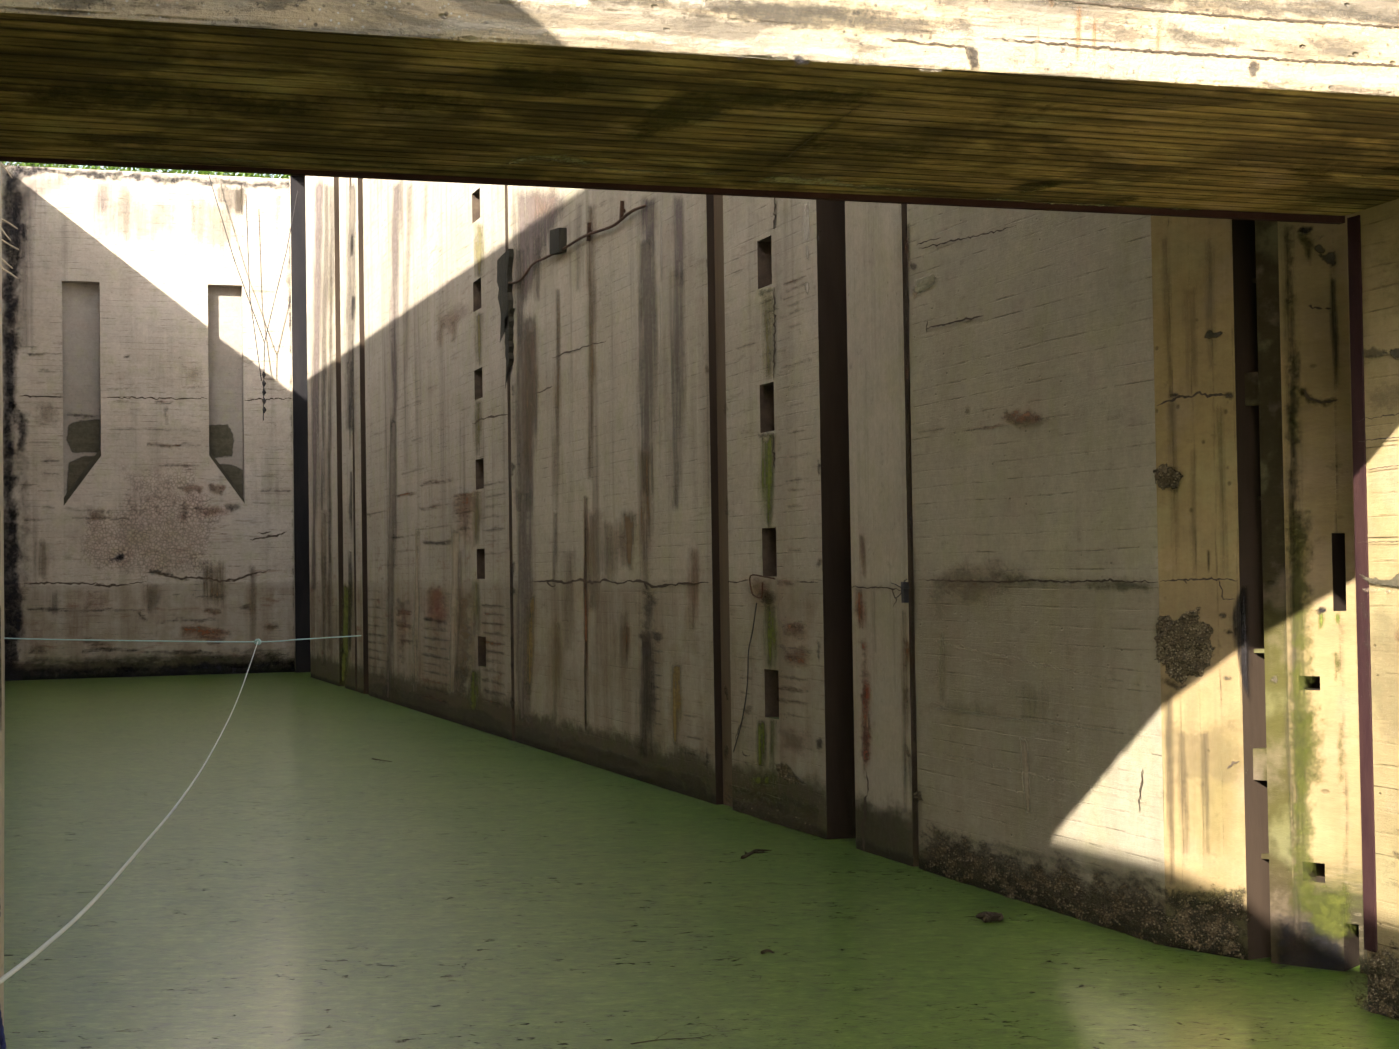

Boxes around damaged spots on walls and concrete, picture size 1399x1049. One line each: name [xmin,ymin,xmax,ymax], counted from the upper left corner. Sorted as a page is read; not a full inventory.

damp [474,226,482,276]
damp [386,184,400,698]
damp [515,193,562,720]
damp [606,199,683,570]
spalling [1153,464,1183,490]
crack [22,531,285,588]
damp [450,492,480,711]
crack [529,578,747,590]
damp [640,596,662,755]
crack [852,577,1235,607]
spalling [1154,587,1248,691]
damp [1272,380,1350,971]